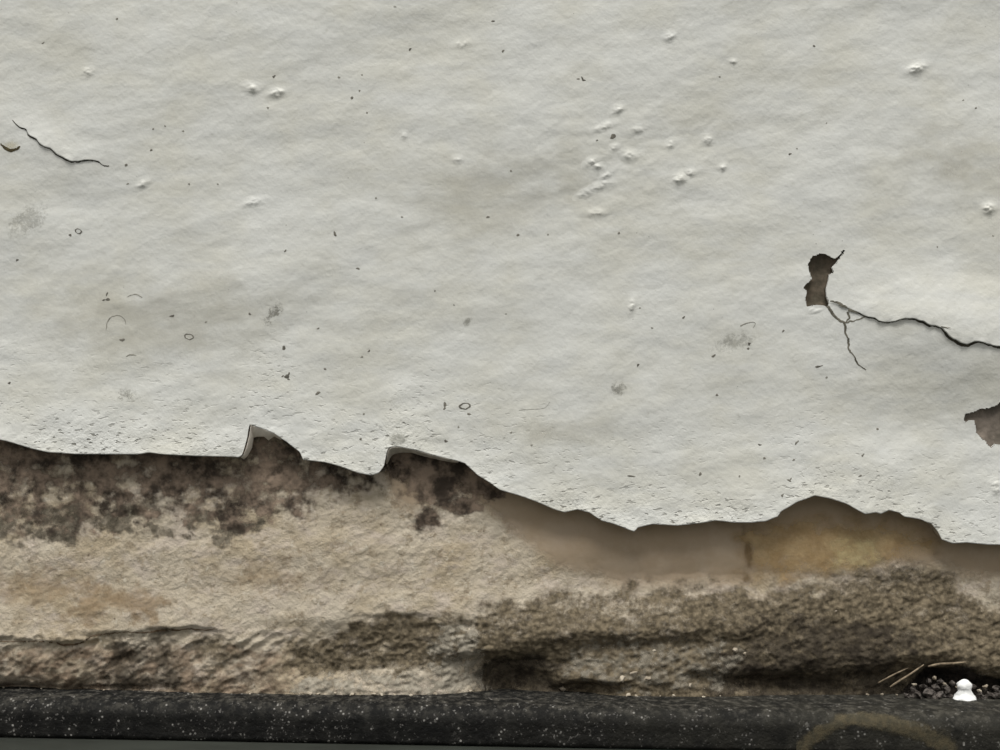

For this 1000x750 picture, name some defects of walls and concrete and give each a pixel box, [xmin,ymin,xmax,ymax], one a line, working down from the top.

crack [12,120,109,167]
hole [804,250,845,315]
crack [826,300,1000,370]
spalling [964,402,1000,448]
mould [0,437,376,548]
spalling [0,425,1000,695]
damp [291,624,488,695]